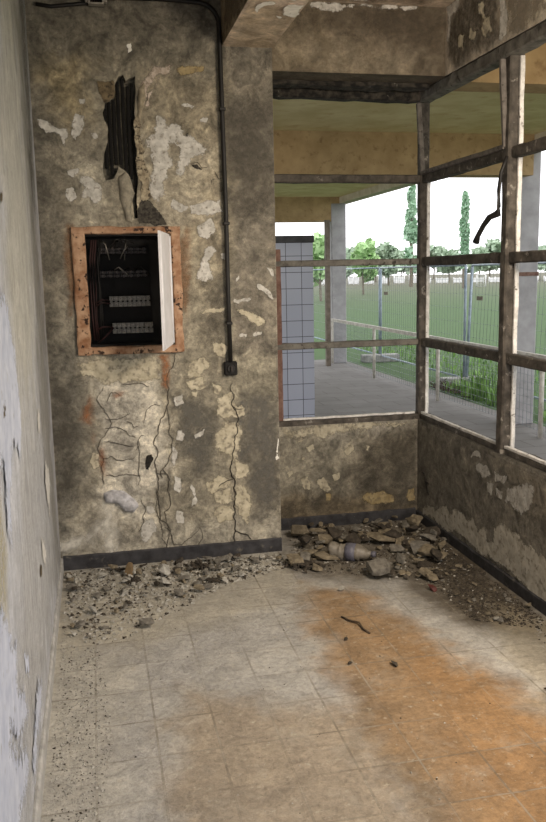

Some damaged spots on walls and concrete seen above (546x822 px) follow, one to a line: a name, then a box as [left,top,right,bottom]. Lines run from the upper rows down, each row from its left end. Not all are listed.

flaking render [277,0,417,19]
leakage [449,0,497,66]
peeling [446,0,508,49]
leakage [508,0,546,33]
peeling [37,113,98,146]
peeling [65,168,102,203]
peeling [133,115,225,282]
peeling [233,297,265,337]
crack [96,353,203,548]
crack [219,384,251,541]
peeling [471,450,534,515]
flaking render [421,504,546,601]